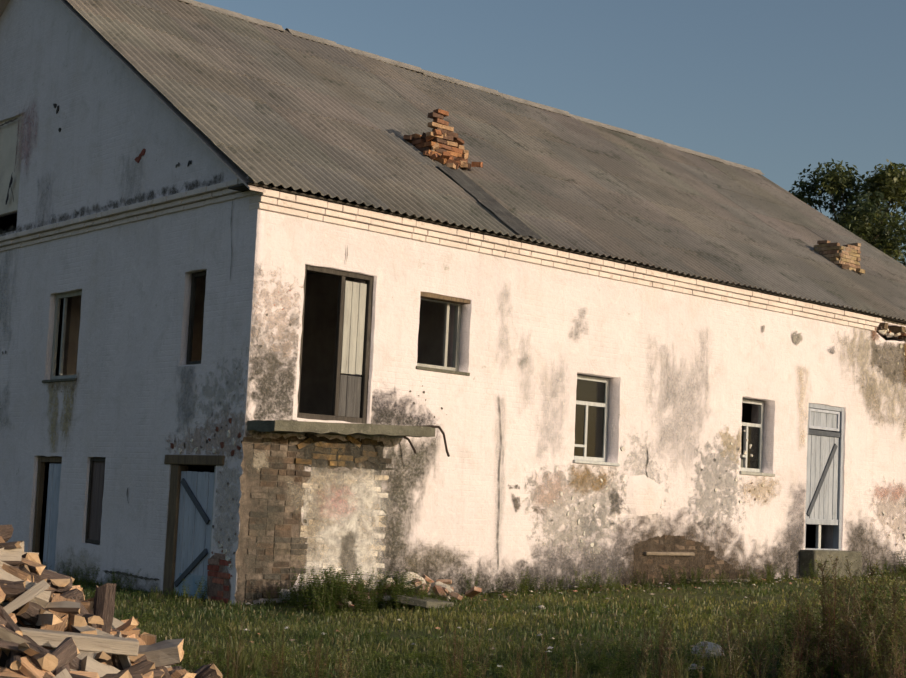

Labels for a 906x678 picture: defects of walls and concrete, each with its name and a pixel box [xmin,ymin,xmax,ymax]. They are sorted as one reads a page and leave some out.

leakage [246,317,299,421]
leakage [372,385,443,426]
leakage [840,329,906,424]
spalling [871,326,906,385]
flaking render [167,359,394,605]
leakage [379,439,632,596]
flaking render [870,484,906,546]